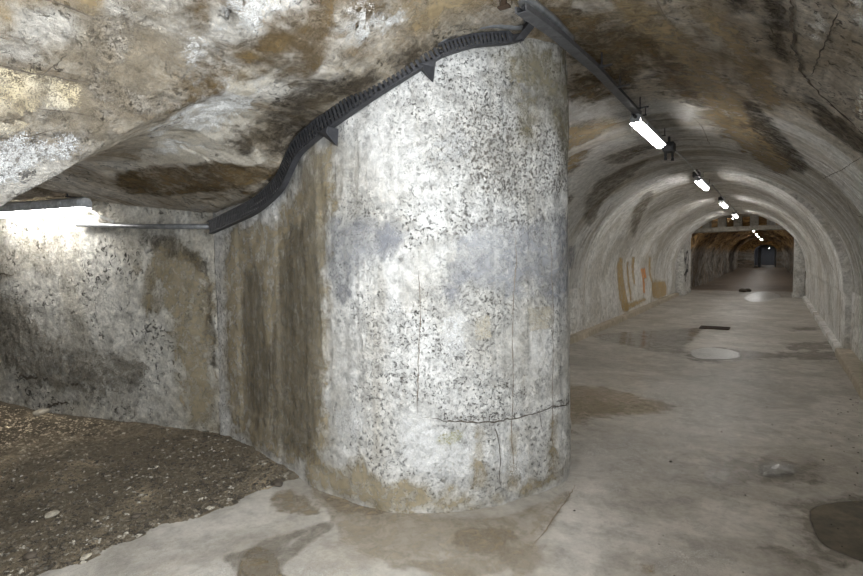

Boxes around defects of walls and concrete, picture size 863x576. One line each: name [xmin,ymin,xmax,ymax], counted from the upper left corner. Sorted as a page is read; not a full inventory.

leakage [67,0,496,200]
leakage [504,0,808,175]
leakage [809,97,863,153]
leakage [583,146,651,225]
leakage [631,191,653,232]
leakage [115,143,574,576]
crack [425,400,570,479]
leakage [570,386,675,424]